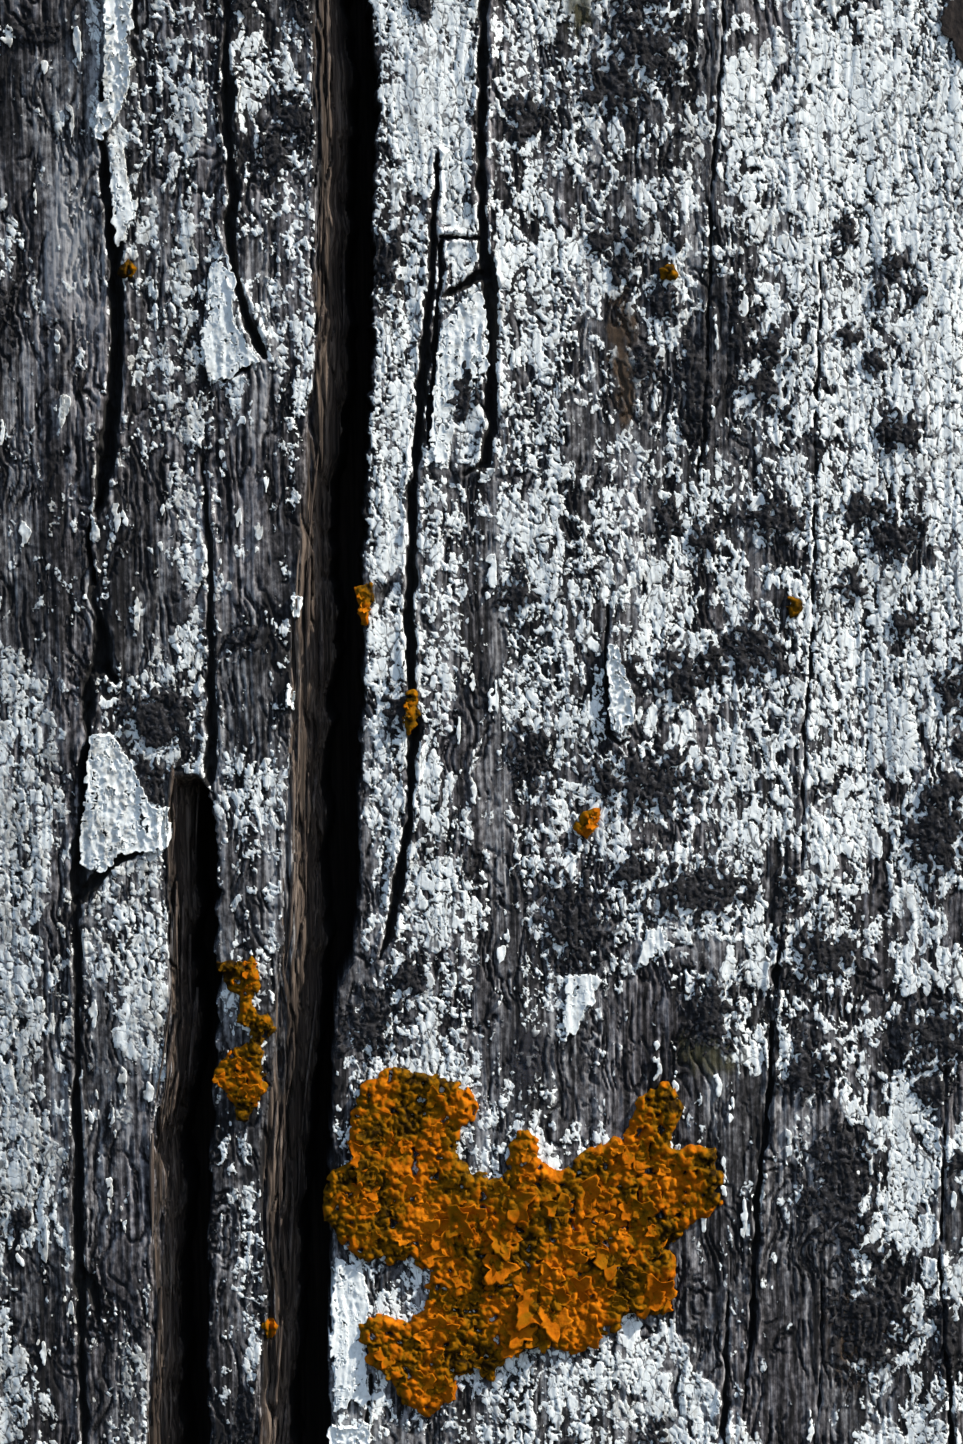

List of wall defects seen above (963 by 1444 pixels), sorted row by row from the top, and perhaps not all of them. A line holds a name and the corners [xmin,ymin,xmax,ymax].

peeling [0,0,181,873]
crack [132,0,140,35]
crack [69,81,223,1444]
crack [221,0,268,382]
peeling [200,254,303,757]
crack [252,0,499,1444]
peeling [429,292,490,464]
peeling [440,488,526,1093]
peeling [3,1225,80,1444]
peeling [326,1258,416,1444]
peeling [550,927,861,1444]
crack [719,948,781,1444]